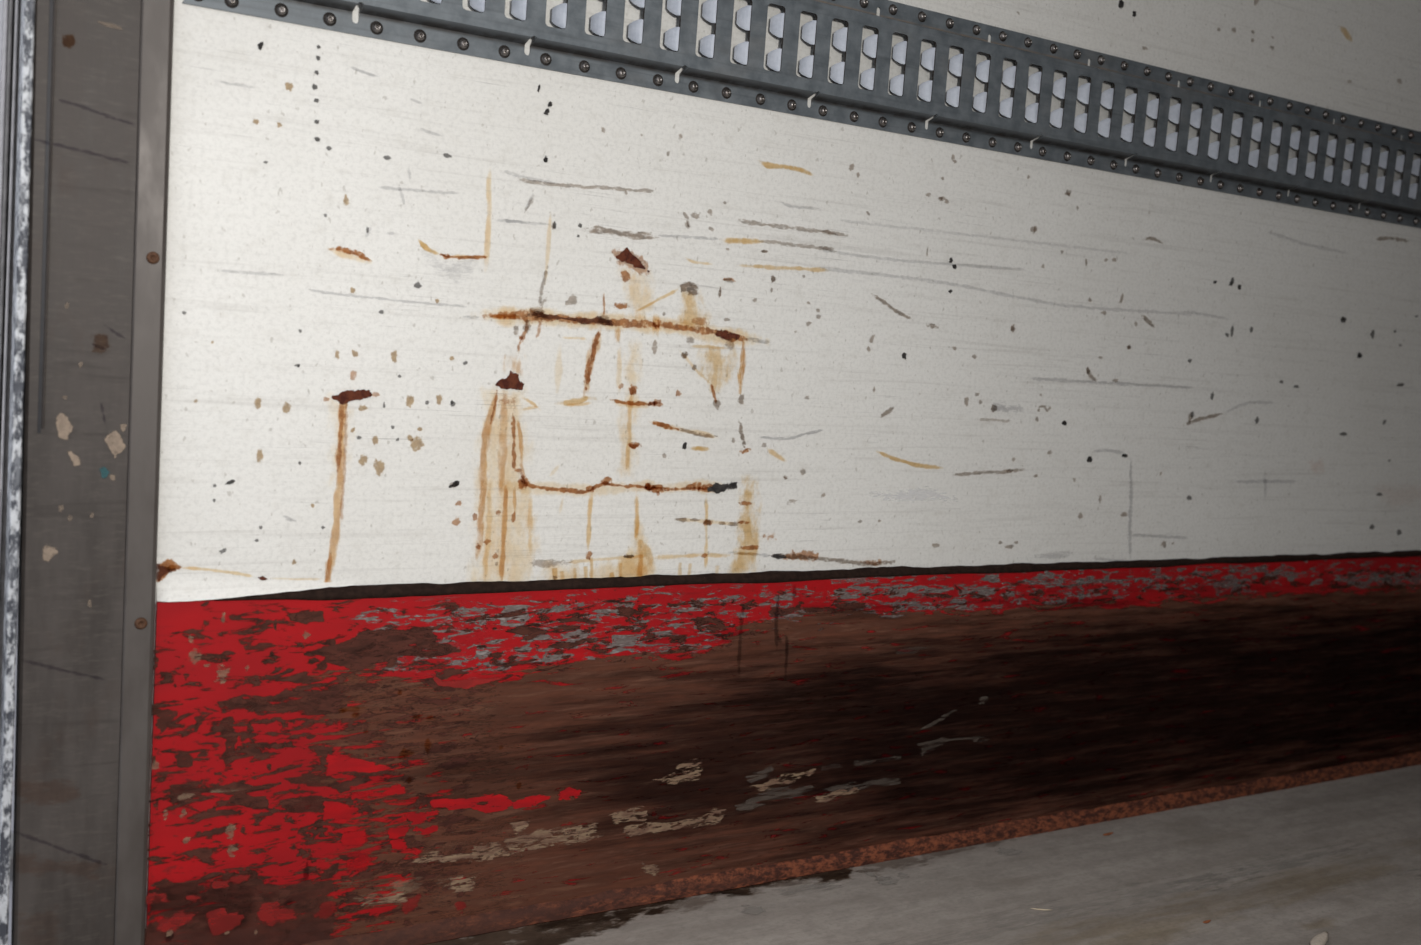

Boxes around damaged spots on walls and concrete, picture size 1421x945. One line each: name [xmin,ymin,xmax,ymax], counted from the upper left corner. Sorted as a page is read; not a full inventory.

rust [332,389,372,404]
rust [496,371,524,390]
rust [508,311,740,390]
rust [512,420,713,494]
peeling [156,560,181,582]
peeling [145,582,1421,945]